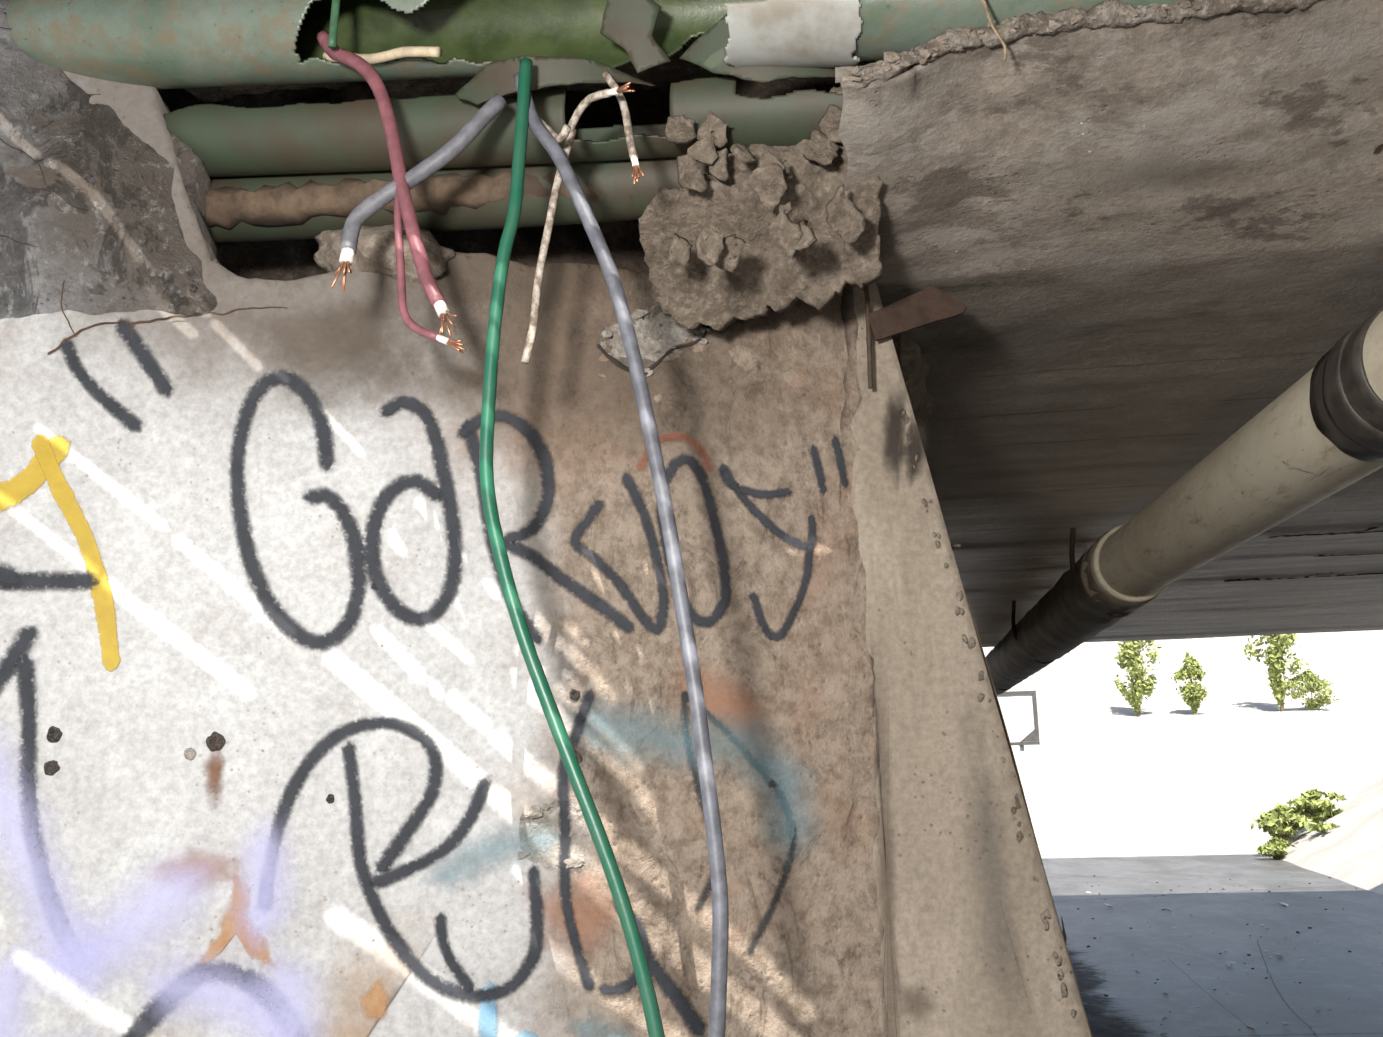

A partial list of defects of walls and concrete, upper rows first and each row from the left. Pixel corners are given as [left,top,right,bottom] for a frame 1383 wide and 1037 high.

spalling [861,0,1319,88]
spalling [599,86,883,389]